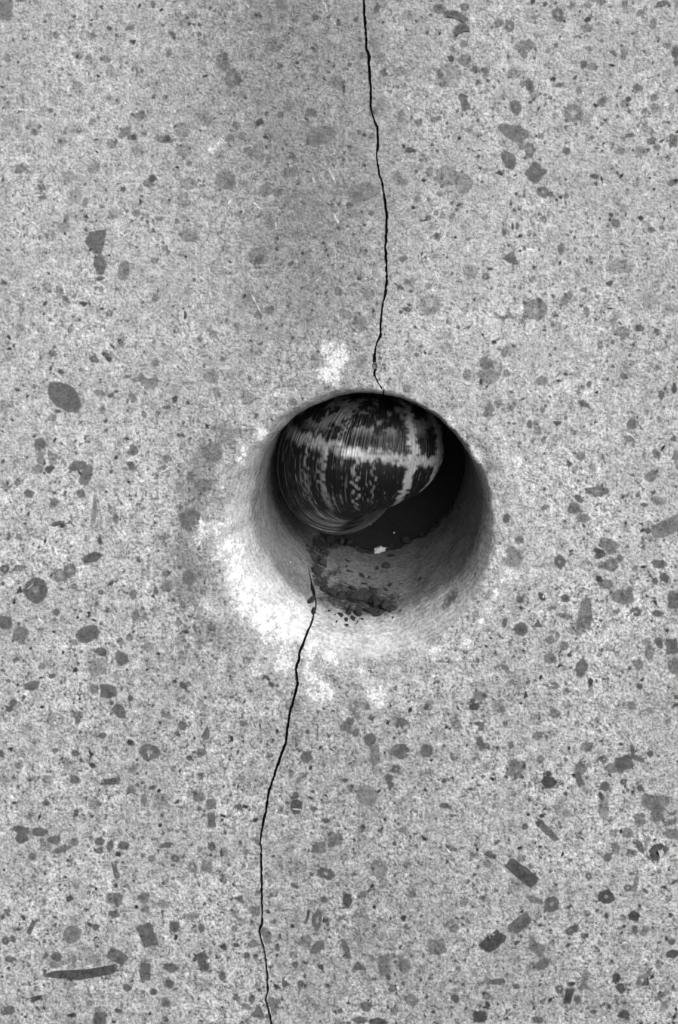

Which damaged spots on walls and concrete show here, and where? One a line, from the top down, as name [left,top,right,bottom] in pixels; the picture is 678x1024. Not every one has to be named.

crack [362,0,388,392]
crack [258,562,317,1024]